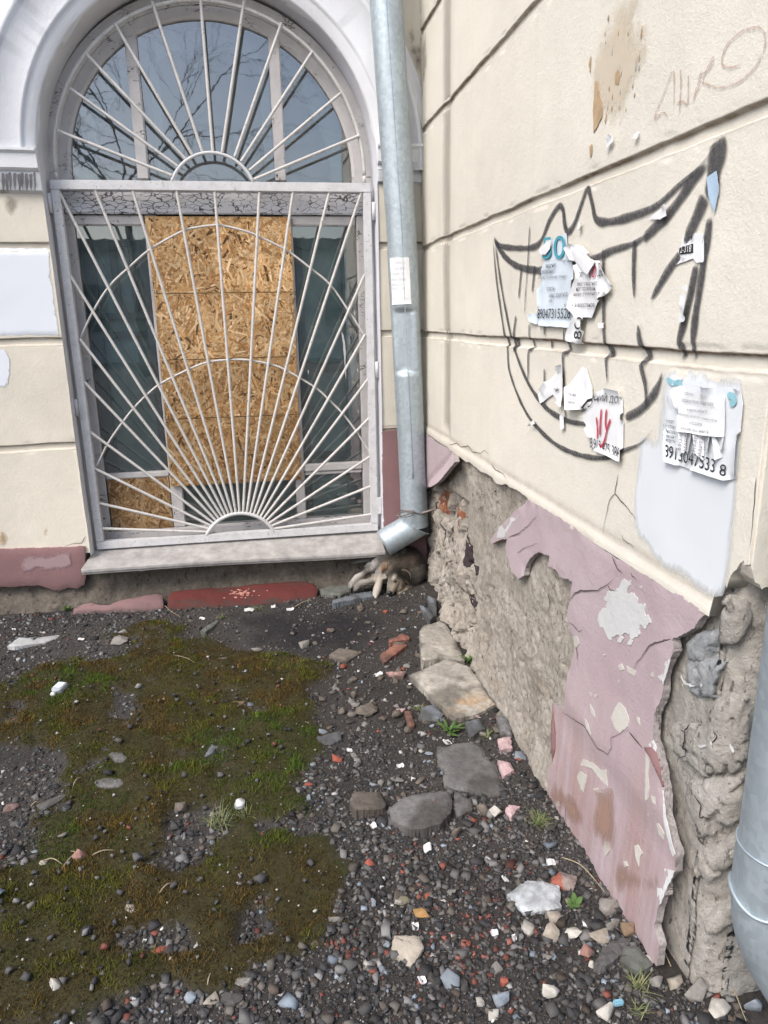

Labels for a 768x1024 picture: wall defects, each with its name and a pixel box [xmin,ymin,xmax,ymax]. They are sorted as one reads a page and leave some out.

peeling [589,11,643,157]
flaking render [425,457,580,806]
crack [548,476,636,652]
peeling [597,579,652,645]
peeling [577,759,608,794]
peeling [611,702,640,733]
peeling [623,845,643,867]
flaking render [644,582,768,996]